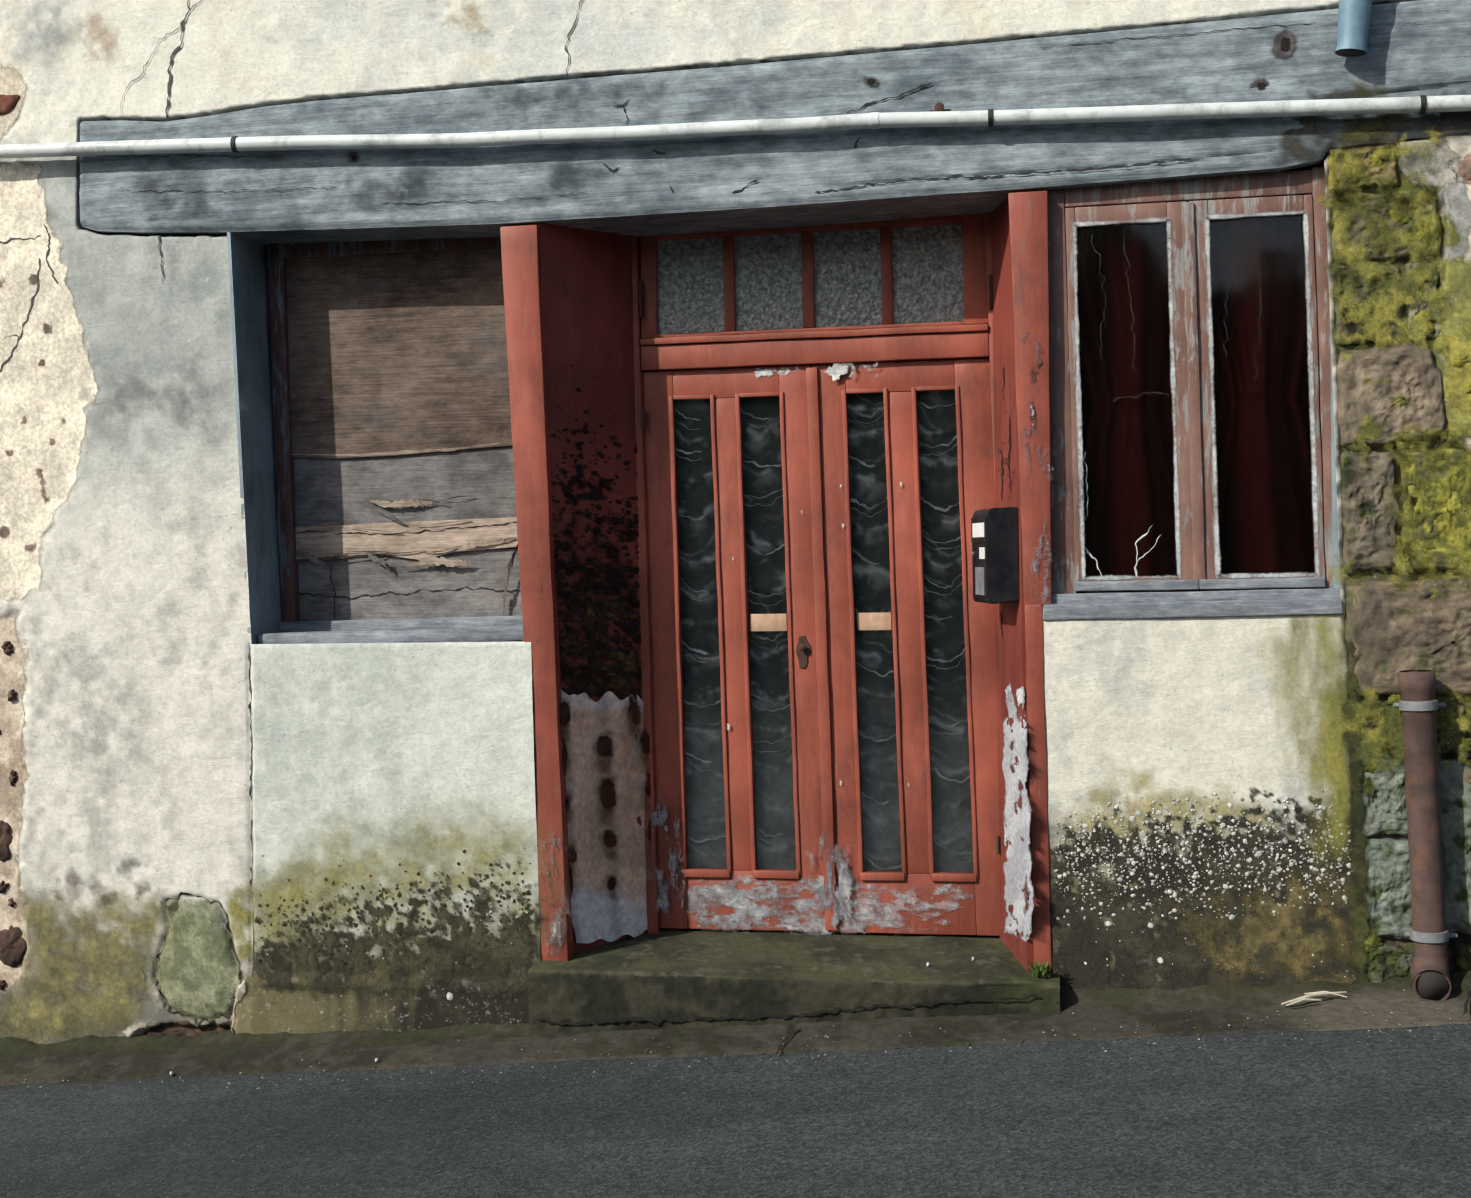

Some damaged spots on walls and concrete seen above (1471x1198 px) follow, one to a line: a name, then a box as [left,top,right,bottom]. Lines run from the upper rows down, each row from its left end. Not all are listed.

flaking render [0,64,27,139]
crack [120,0,202,121]
crack [565,0,582,79]
flaking render [1451,154,1471,184]
crack [0,225,58,371]
flaking render [0,160,98,991]
leakage [0,874,171,1044]
flaking render [123,981,246,1037]
leakage [245,825,545,1004]
peeling [647,801,972,935]
peeling [1002,685,1034,941]
leakage [1049,616,1366,991]